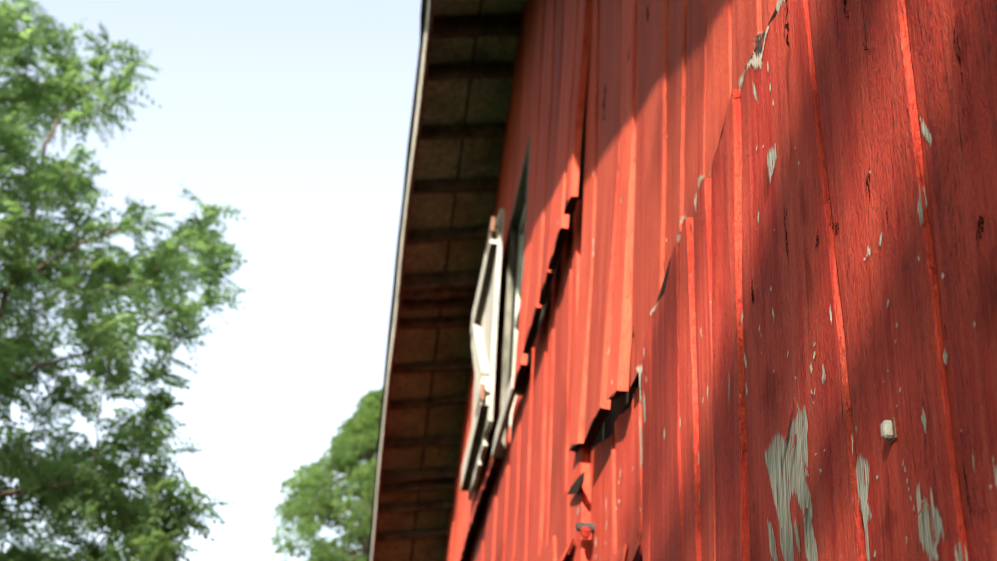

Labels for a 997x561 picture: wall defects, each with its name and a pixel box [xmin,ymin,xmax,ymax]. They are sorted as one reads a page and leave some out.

spalling [746,26,769,69]
peeling [756,145,777,183]
peeling [765,342,826,561]
peeling [852,426,878,561]
peeling [902,460,944,561]
peeling [954,537,968,561]